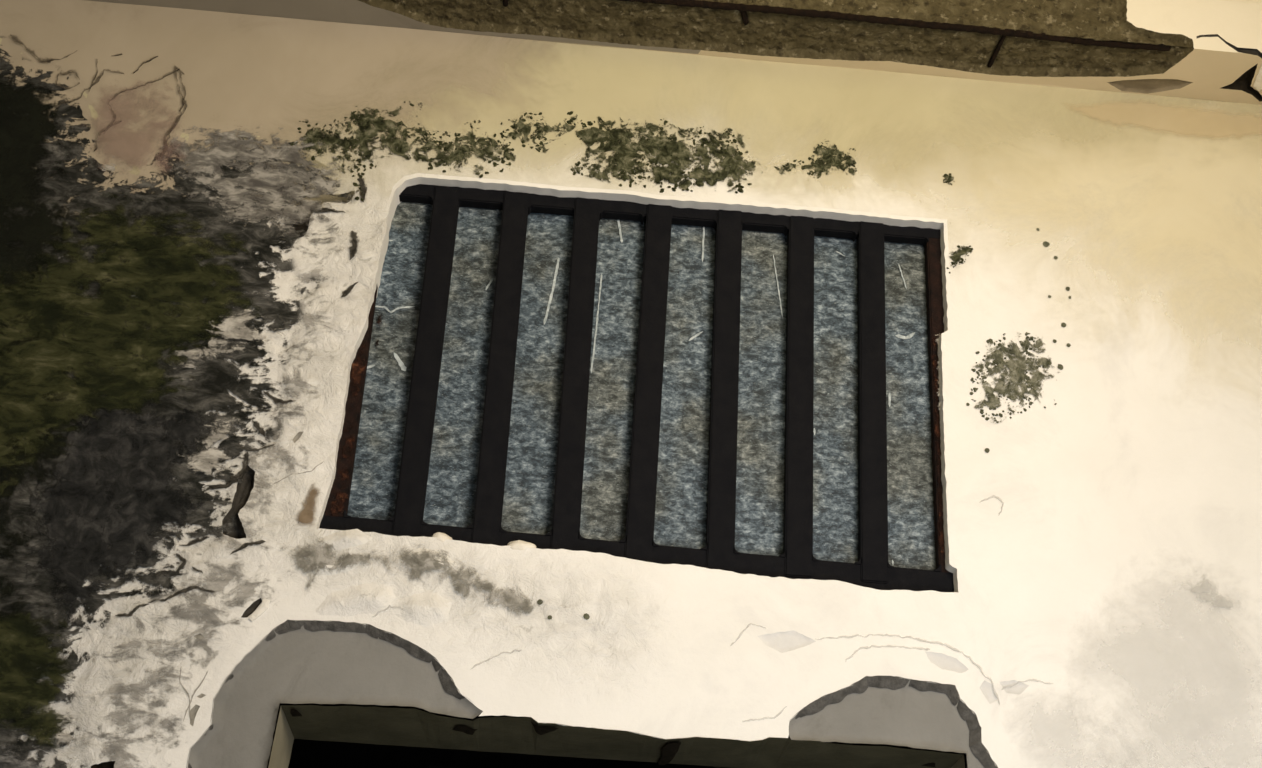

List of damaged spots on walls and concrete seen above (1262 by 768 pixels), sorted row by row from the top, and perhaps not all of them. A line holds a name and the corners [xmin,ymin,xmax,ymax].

crack [10,34,187,165]
spalling [358,0,1194,94]
crack [1196,34,1262,102]
water stain [313,39,1262,326]
water stain [0,37,351,768]
corrosion [331,340,379,517]
spalling [241,598,270,622]
spalling [190,620,472,740]
spalling [531,722,558,735]
spalling [758,630,816,653]
spalling [789,651,998,768]
spalling [979,680,1030,704]